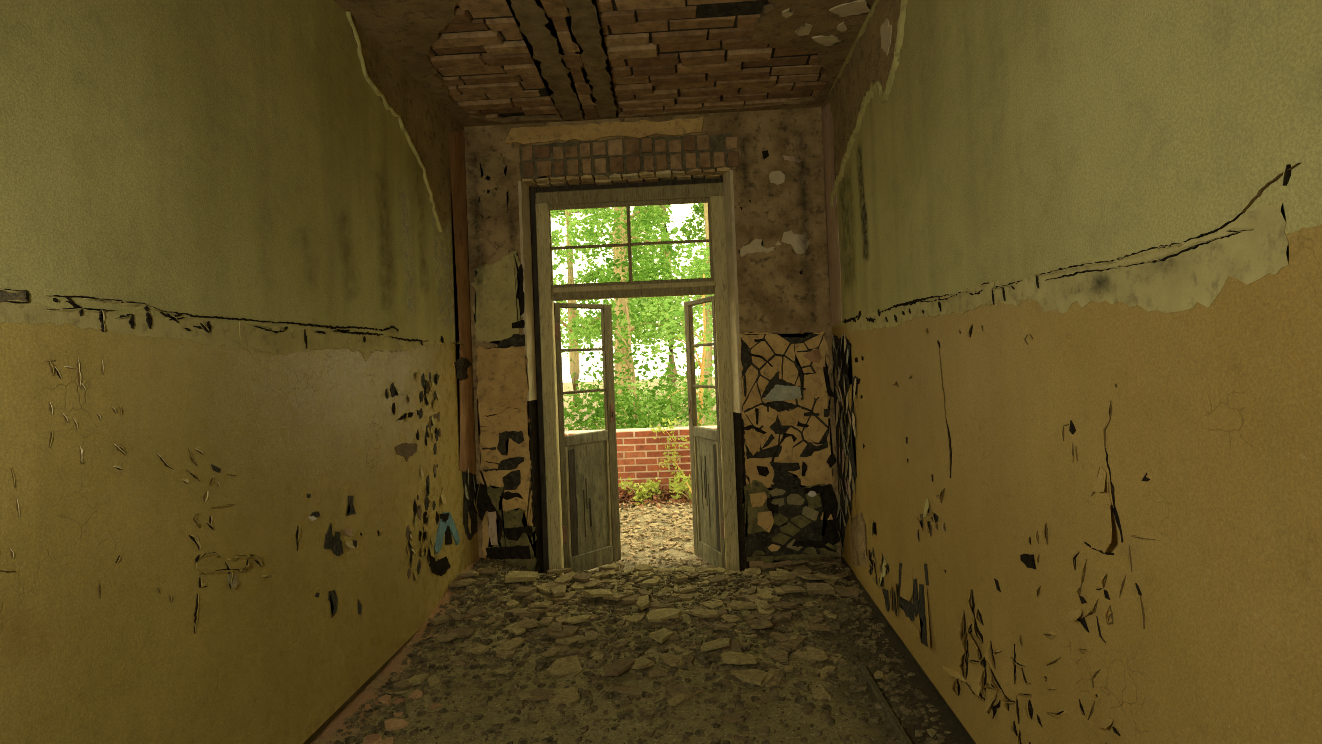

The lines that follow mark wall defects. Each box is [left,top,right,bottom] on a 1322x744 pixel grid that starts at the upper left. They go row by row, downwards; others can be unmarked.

flaking render [0,0,560,581]
peeling [315,590,338,618]
peeling [966,632,997,714]
peeling [742,202,1289,648]